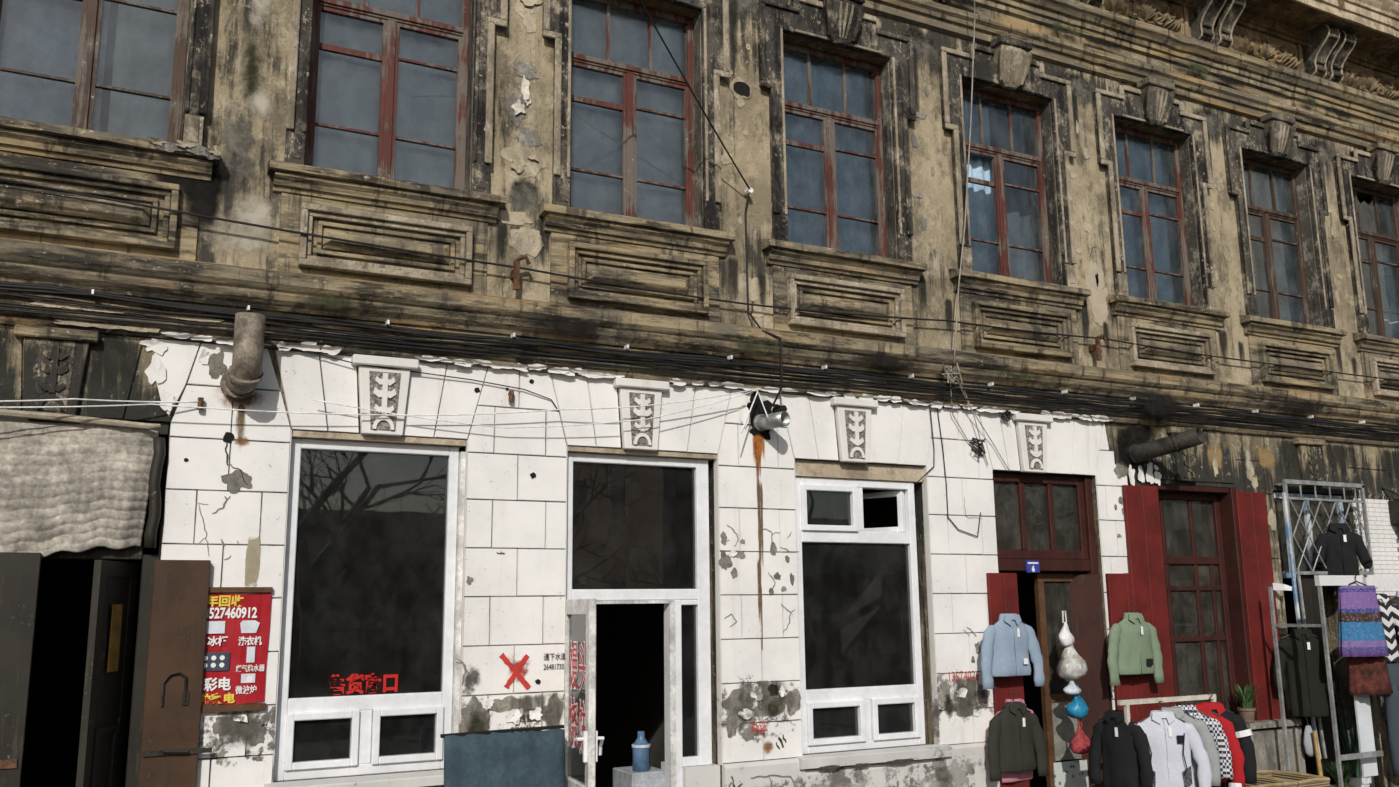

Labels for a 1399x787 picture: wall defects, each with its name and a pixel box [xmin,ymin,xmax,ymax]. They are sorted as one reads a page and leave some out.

damp [153,46,272,251]
spalling [497,62,546,257]
damp [509,180,547,246]
damp [728,258,738,295]
peeling [30,300,233,412]
peeling [264,341,342,355]
damp [1081,297,1109,351]
corrosion [225,394,257,445]
corrosion [753,435,764,472]
damp [1246,441,1300,471]
peeling [460,670,564,733]
peeling [212,711,268,750]